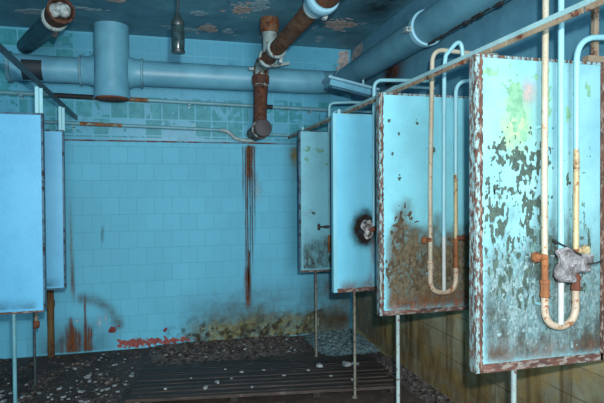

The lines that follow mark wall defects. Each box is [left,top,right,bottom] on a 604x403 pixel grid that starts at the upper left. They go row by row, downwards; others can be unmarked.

peeling [221,0,270,18]
peeling [313,17,366,32]
corrosion [245,146,255,305]
corrosion [389,212,469,310]
peeling [482,62,599,346]
corrosion [66,297,92,352]
peeling [108,317,234,348]
water stain [187,281,410,367]